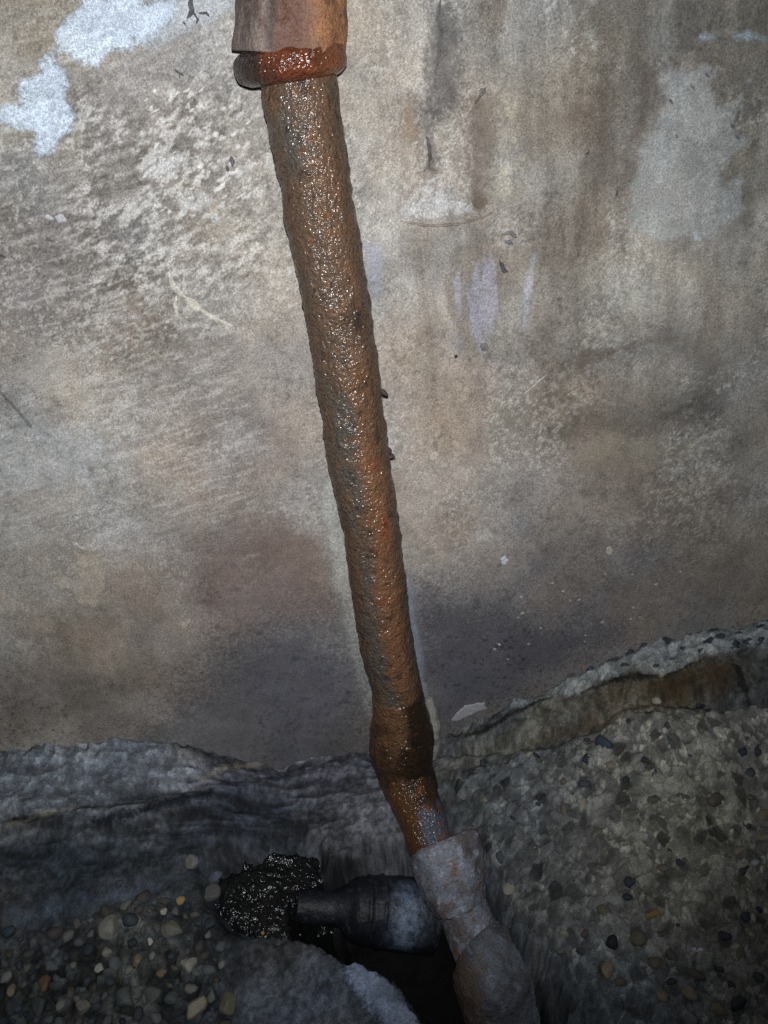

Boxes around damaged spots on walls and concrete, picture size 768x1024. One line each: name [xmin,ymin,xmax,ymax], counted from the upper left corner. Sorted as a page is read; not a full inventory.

damp [423,5,460,131]
damp [452,261,498,347]
damp [523,255,536,327]
damp [156,612,370,770]
damp [419,605,615,737]
spalling [504,620,768,714]
spalling [449,697,768,1024]